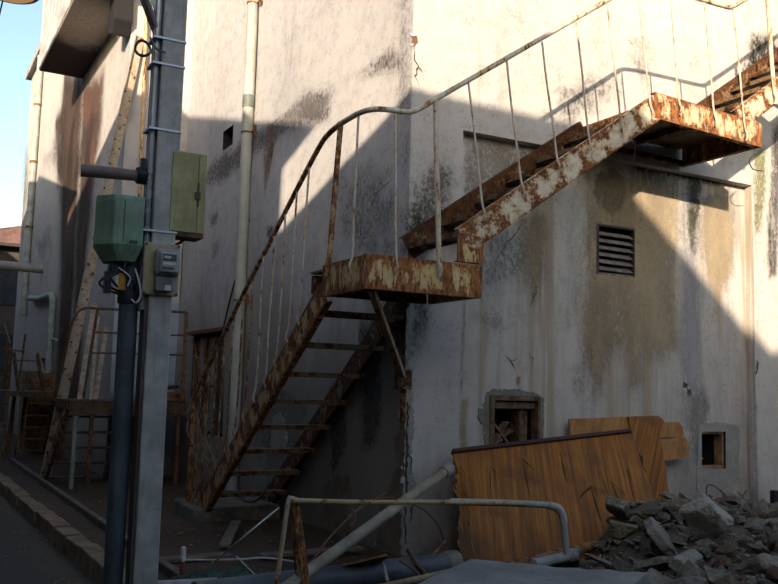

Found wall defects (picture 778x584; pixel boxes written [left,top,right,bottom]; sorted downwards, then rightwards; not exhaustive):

leakage [252,93,332,153]
leakage [207,146,241,183]
rust [264,125,274,187]
leakage [755,126,778,275]
leakage [53,75,103,399]
leakage [571,166,735,456]
flaking render [477,387,546,445]